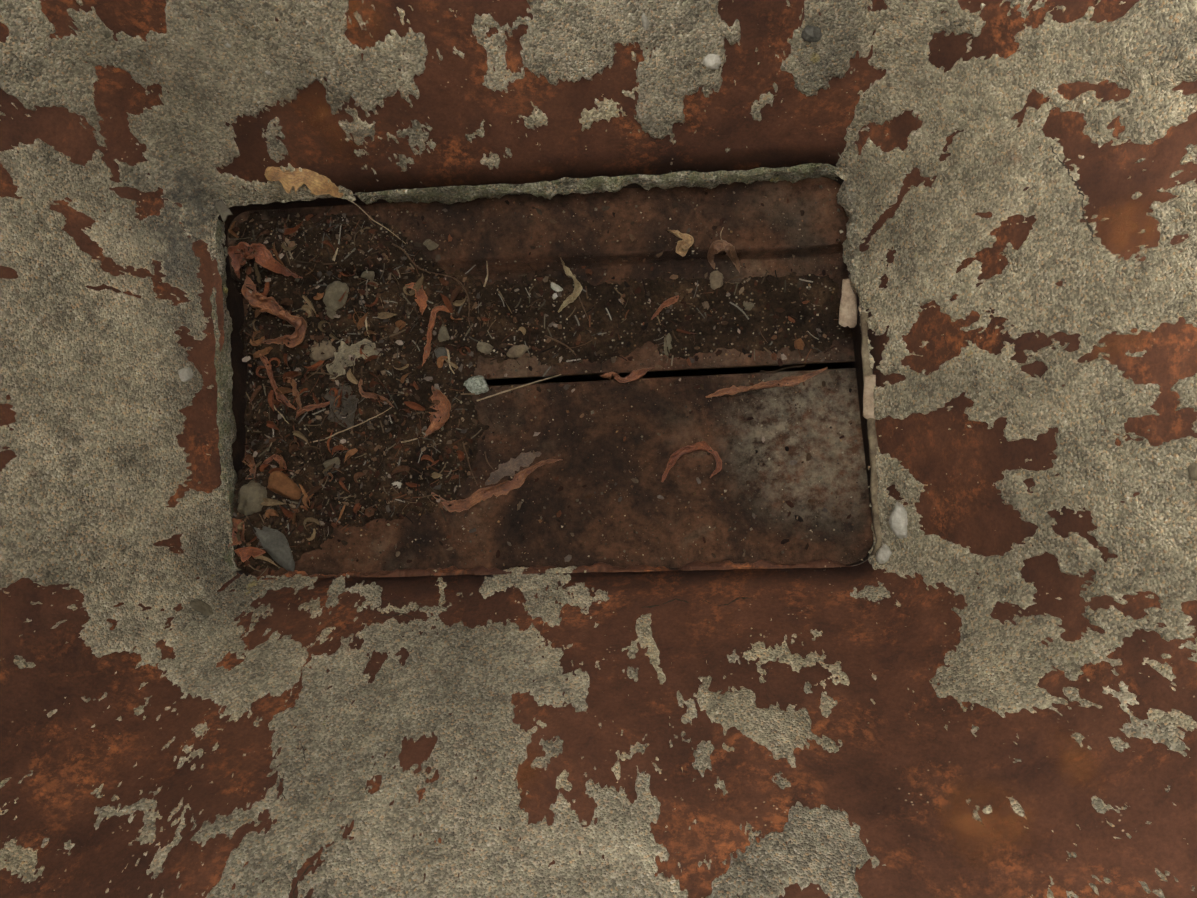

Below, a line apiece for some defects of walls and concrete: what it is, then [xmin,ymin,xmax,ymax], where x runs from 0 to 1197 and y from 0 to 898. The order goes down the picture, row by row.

peeling [328,101,414,181]
peeling [480,101,548,173]
rust [1011,80,1197,254]
rust [0,266,18,279]
rust [901,300,1197,446]
peeling [419,570,473,623]
rust [156,639,176,660]
peeling [1142,637,1197,691]
peeling [1049,657,1197,750]
peeling [556,770,572,792]
peeling [611,730,627,791]
peeling [1091,796,1131,839]